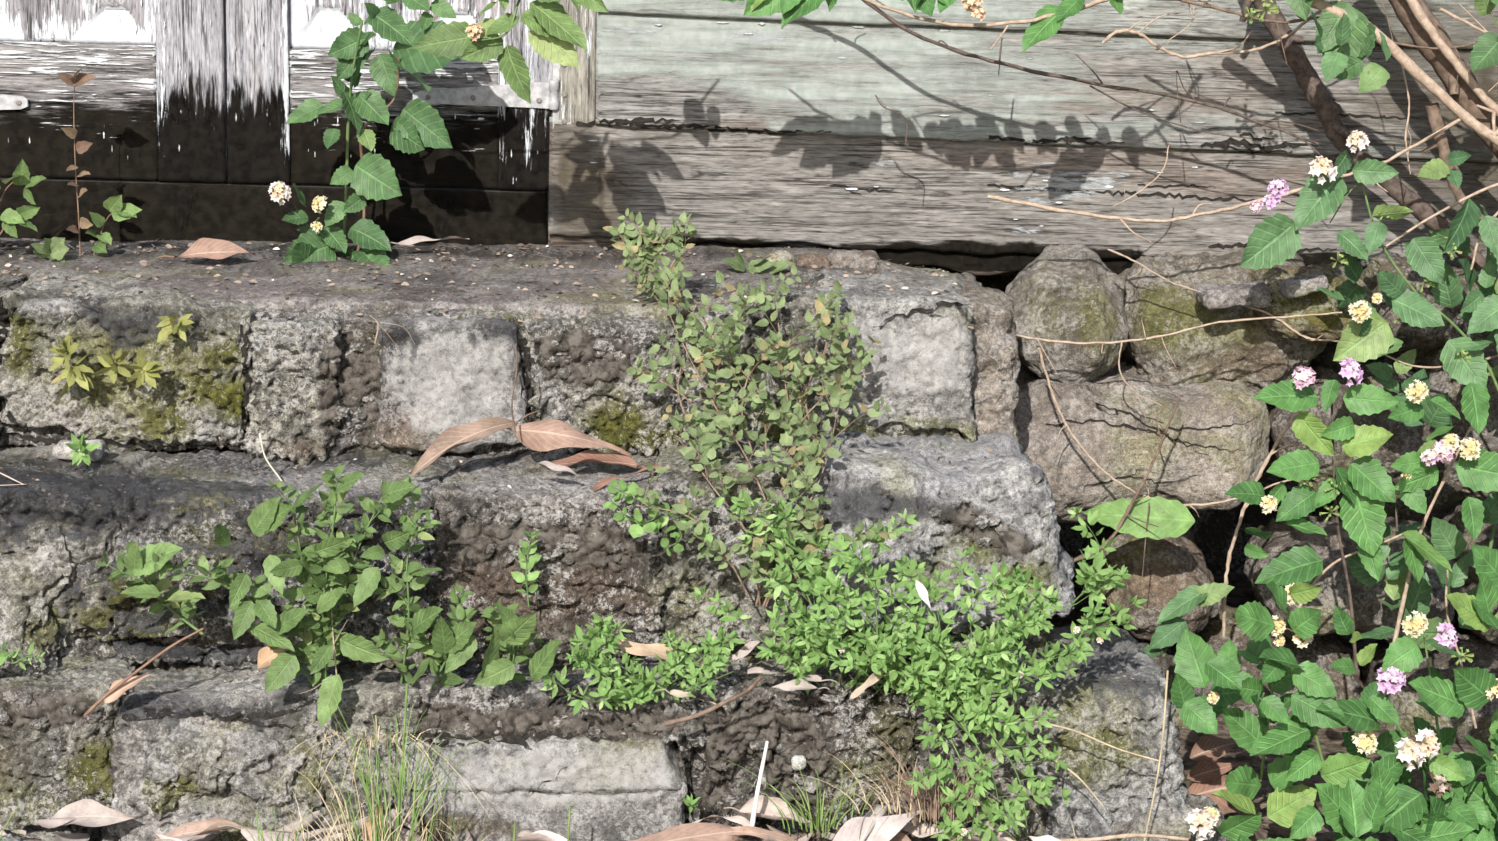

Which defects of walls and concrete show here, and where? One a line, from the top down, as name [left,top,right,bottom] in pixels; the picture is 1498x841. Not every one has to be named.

peeling [0,0,196,126]
crack [1046,402,1260,487]